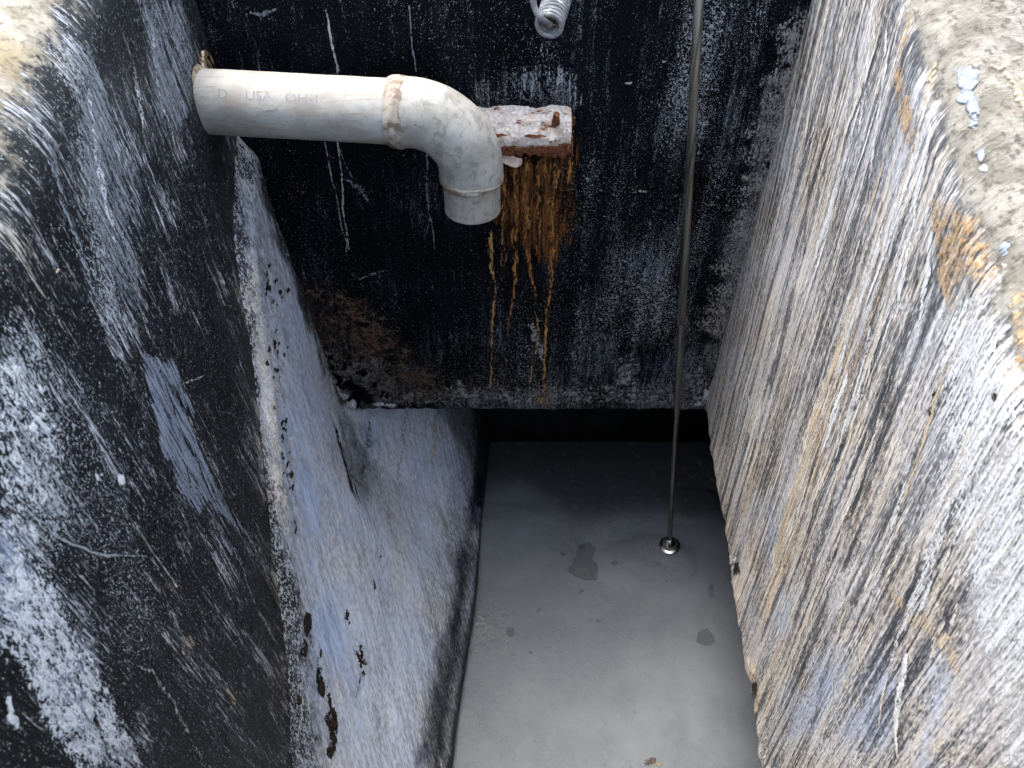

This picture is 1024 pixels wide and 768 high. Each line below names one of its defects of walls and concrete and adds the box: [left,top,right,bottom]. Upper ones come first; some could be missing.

peeling [955,65,981,130]
peeling [976,149,988,171]
corrosion [486,117,578,406]
corrosion [928,199,996,312]
water stain [300,262,687,479]
corrosion [1010,287,1024,368]